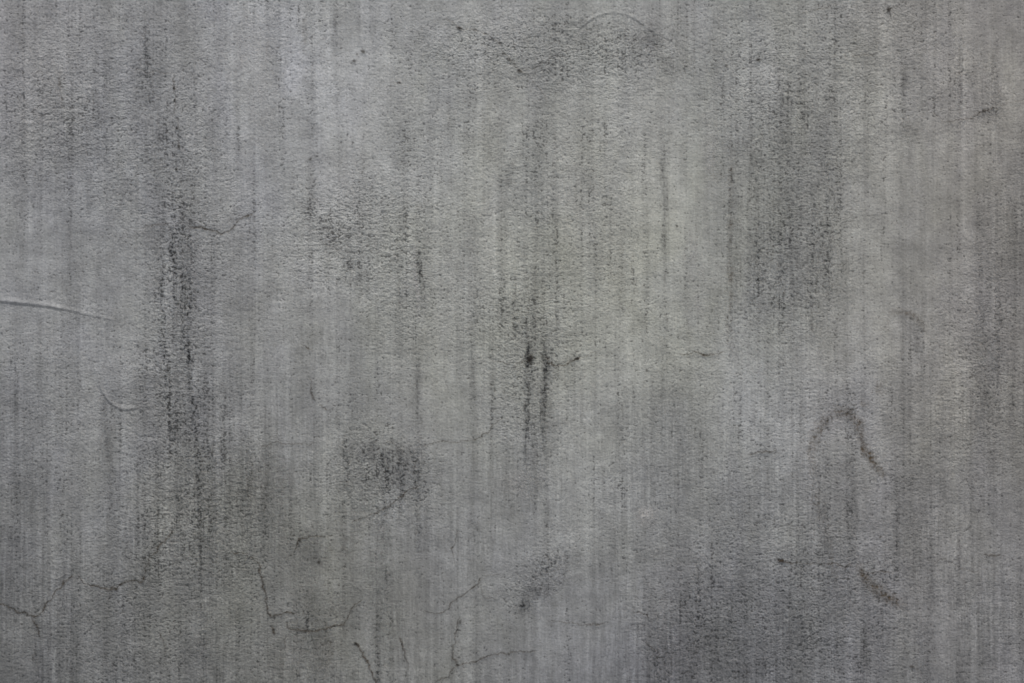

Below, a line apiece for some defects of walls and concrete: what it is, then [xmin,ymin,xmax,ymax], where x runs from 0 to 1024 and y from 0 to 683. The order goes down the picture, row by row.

crack [193,214,252,235]
crack [0,530,173,637]
crack [234,552,376,682]
crack [439,579,524,680]